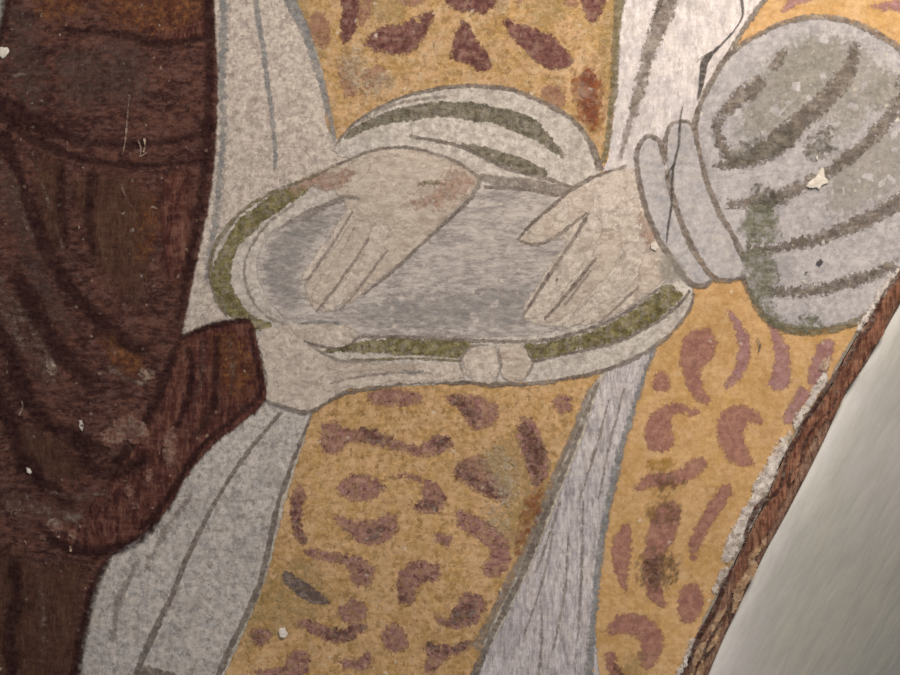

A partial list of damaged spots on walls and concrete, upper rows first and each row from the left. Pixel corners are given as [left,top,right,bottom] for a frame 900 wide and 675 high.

crack [666,0,744,241]
spalling [806,156,828,189]
flaking render [677,268,900,675]